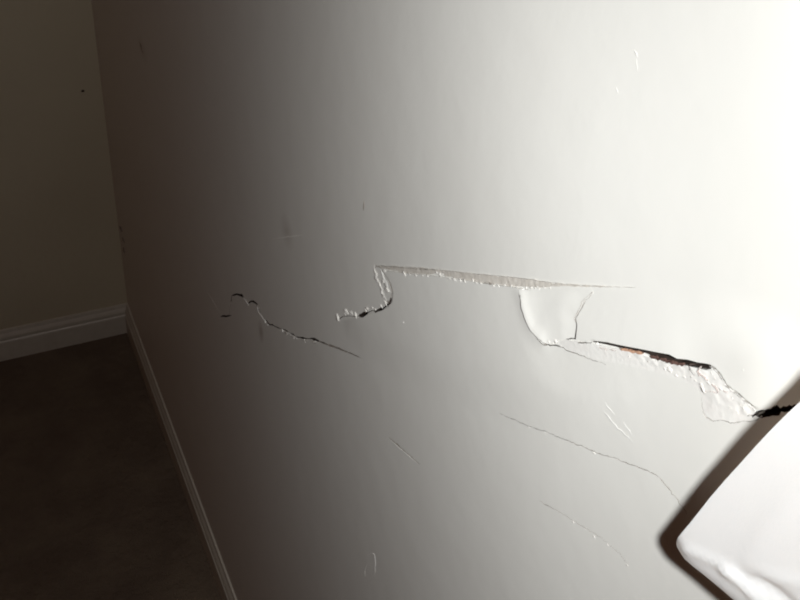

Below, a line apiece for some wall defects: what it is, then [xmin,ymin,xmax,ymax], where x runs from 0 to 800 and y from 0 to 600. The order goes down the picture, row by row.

crack [205,289,360,358]
crack [336,267,392,321]
flaking render [375,265,759,423]
crack [503,415,684,509]